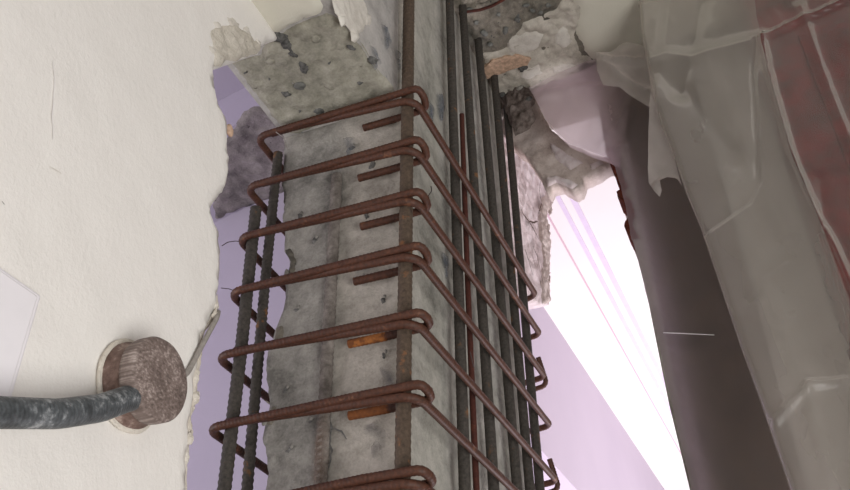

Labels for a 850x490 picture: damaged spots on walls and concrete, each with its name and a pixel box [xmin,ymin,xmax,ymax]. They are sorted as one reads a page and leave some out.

spalling [209,0,415,490]
flaking render [445,0,640,490]